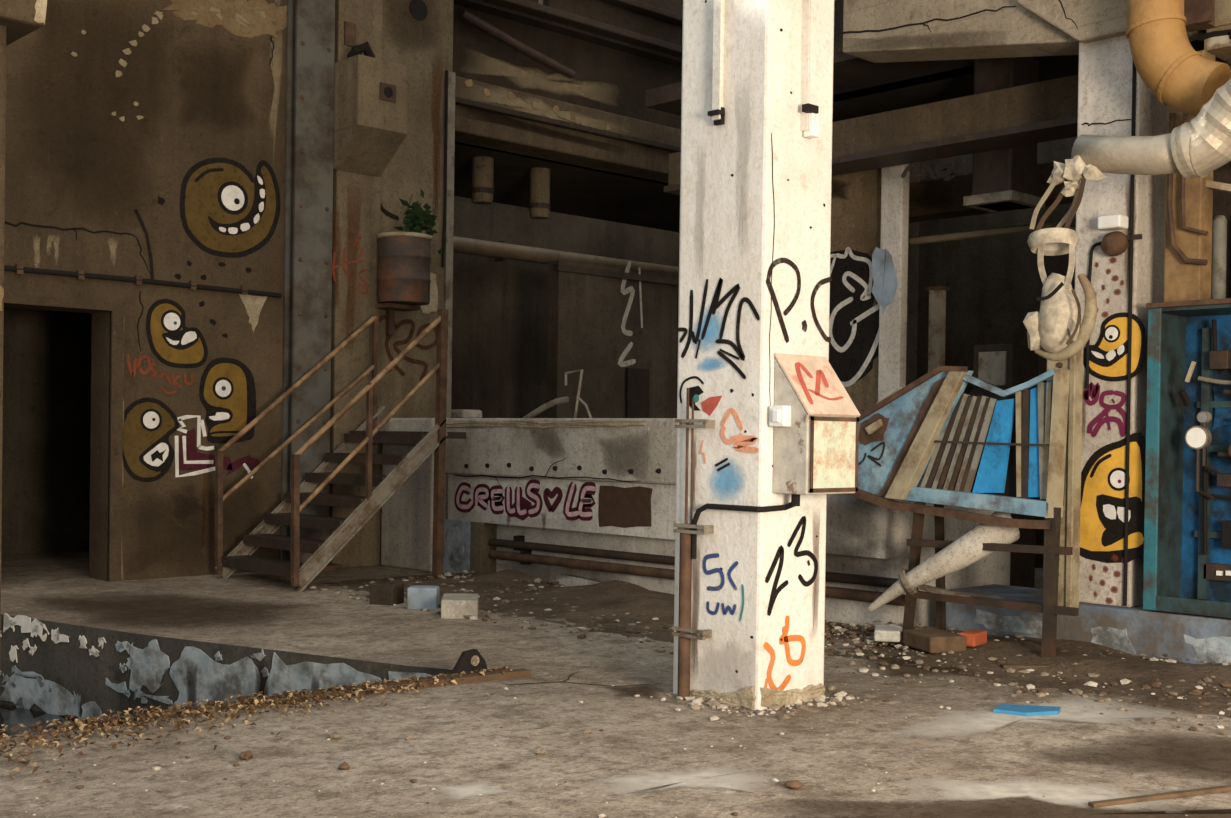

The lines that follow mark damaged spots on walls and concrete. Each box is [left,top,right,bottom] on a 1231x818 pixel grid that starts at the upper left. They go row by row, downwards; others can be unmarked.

spalling [115,0,287,77]
crack [834,6,1016,37]
crack [1196,29,1231,40]
peeling [1090,627,1136,654]
peeling [1183,634,1231,664]
spalling [0,613,531,732]